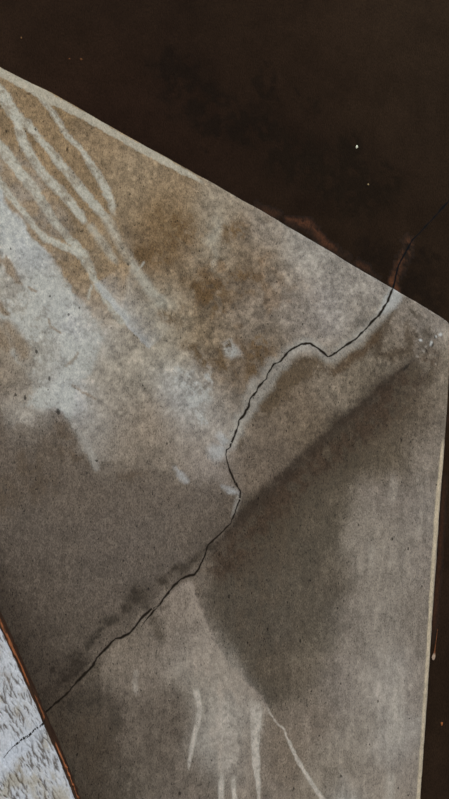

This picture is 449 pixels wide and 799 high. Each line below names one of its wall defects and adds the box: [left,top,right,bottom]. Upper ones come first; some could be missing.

damp [0,82,272,710]
crack [3,200,449,758]
damp [47,427,438,799]
damp [130,33,449,595]
rust [253,199,415,293]